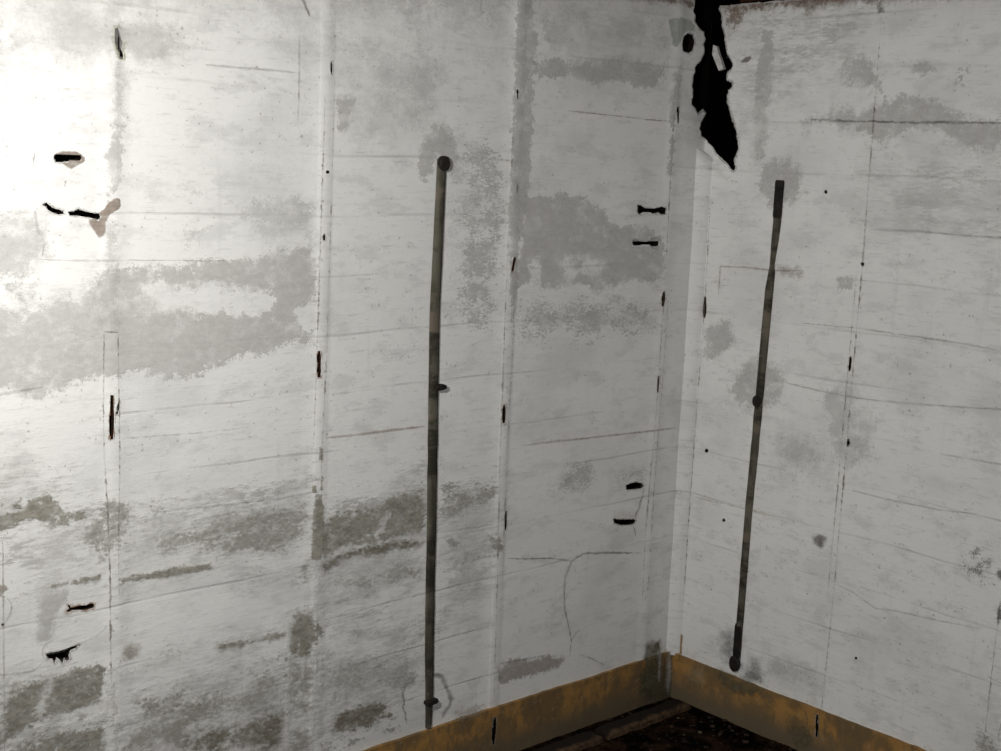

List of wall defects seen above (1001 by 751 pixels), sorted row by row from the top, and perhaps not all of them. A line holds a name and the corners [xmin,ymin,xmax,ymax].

damp [104,123,126,167]
damp [509,0,666,301]
spalling [663,0,800,171]
damp [0,214,47,278]
damp [0,247,318,399]